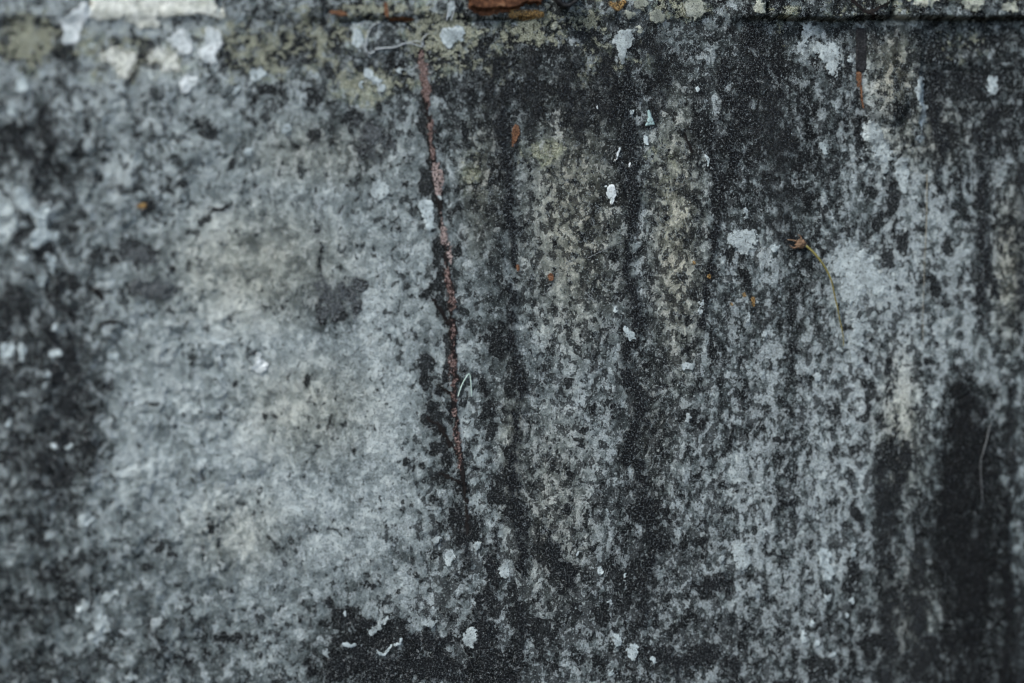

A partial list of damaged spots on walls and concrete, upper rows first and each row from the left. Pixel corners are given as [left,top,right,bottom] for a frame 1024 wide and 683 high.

rust [509,10,544,21]
crack [417,49,470,536]
water stain [482,41,672,628]
water stain [699,20,800,331]
water stain [1014,159,1024,335]
water stain [650,644,742,680]
water stain [875,374,1024,683]